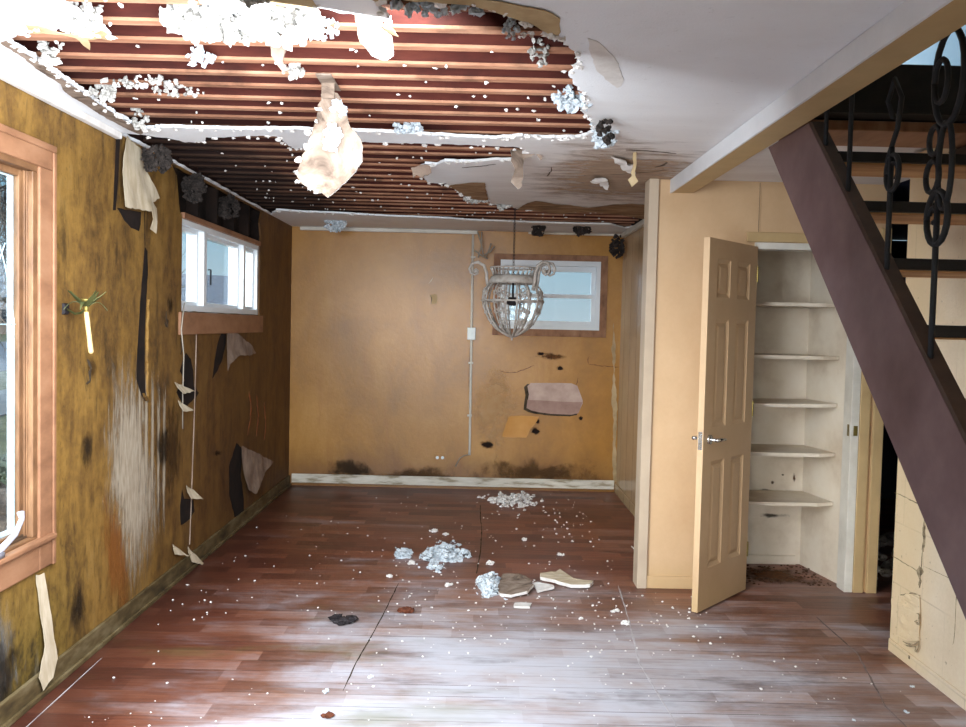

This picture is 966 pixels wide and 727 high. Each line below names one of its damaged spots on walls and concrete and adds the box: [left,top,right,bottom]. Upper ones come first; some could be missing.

peeling [571,38,624,88]
peeling [10,29,177,233]
spalling [232,107,322,194]
spalling [469,90,594,162]
peeling [590,178,609,190]
peeling [611,157,636,174]
peeling [242,446,273,494]
mould [334,461,369,475]
leakage [394,469,444,477]
leakage [499,462,569,479]
crack [891,492,957,644]
leakage [0,629,17,697]